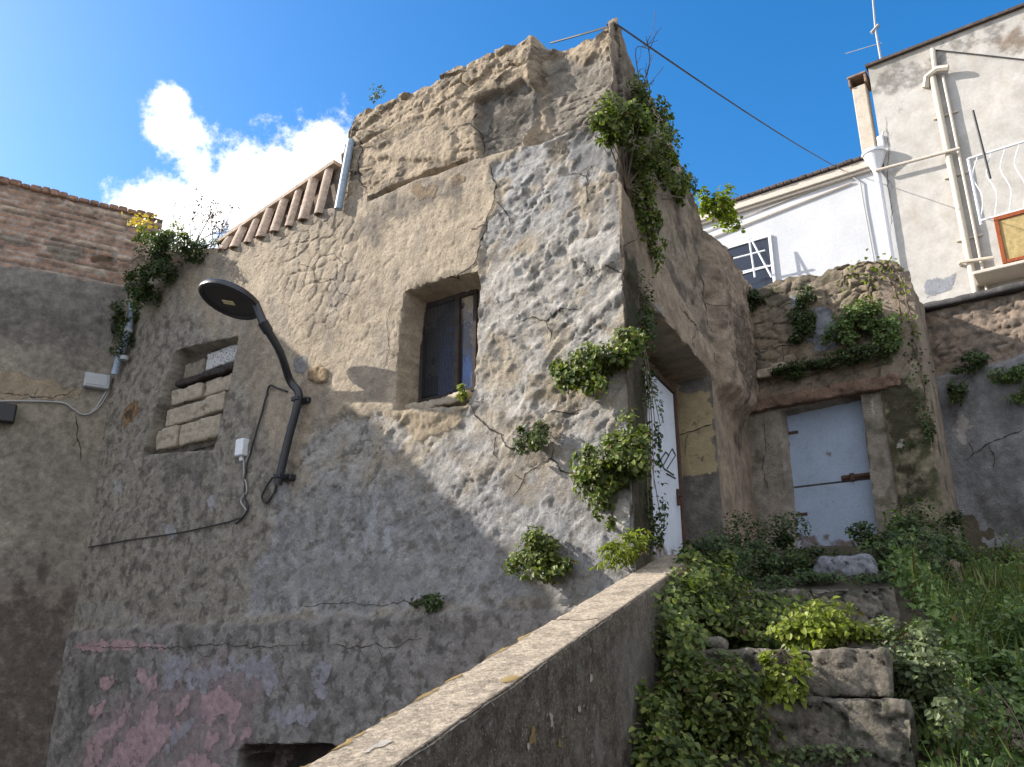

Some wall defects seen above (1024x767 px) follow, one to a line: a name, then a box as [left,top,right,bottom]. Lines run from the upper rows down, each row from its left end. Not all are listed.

crack [446,113,511,279]
crack [3,388,76,399]
crack [470,395,586,496]
peeling [677,390,718,478]
crack [967,429,1023,469]
peeling [75,638,332,767]